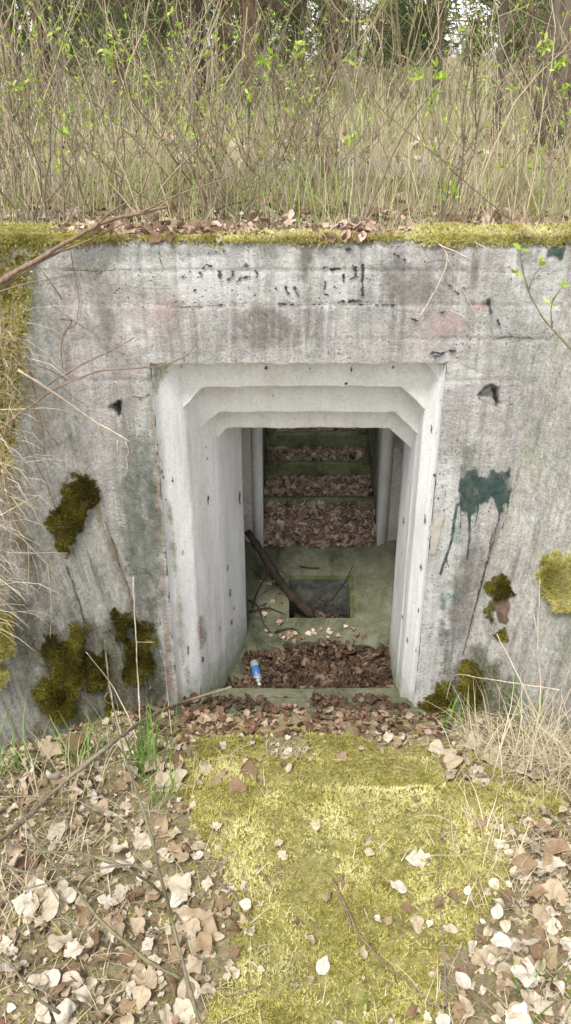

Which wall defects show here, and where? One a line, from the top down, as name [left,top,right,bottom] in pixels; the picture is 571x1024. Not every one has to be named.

spalling [478,384,499,406]